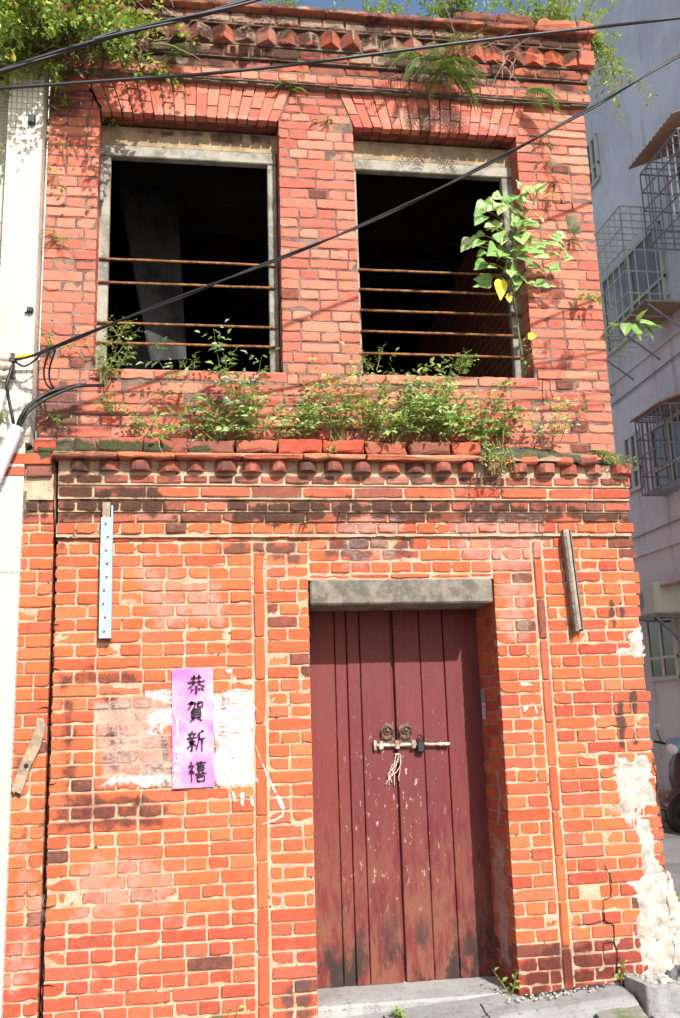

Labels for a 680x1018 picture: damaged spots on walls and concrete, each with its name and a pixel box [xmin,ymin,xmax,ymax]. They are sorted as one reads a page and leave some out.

leakage [133,0,338,70]
leakage [359,12,581,91]
leakage [461,502,629,525]
crack [37,456,63,1018]
peeling [145,689,172,736]
peeling [100,772,173,788]
peeling [633,761,670,915]
crack [575,866,618,974]
leakage [282,981,311,1018]